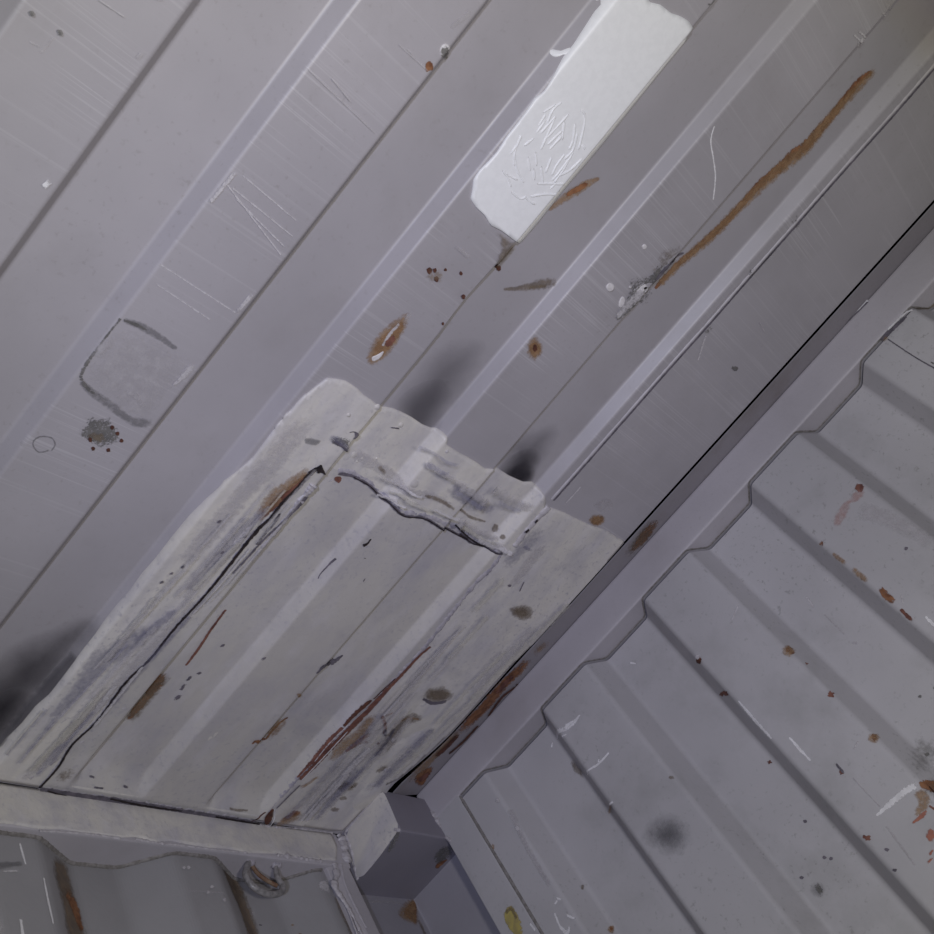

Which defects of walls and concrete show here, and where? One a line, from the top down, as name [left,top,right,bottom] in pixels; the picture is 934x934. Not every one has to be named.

rust [655,71,872,289]
rust [529,339,541,358]
crack [39,441,502,825]
rust [252,717,288,744]
rust [415,661,528,785]
rust [912,780,934,823]
rust [55,862,83,934]